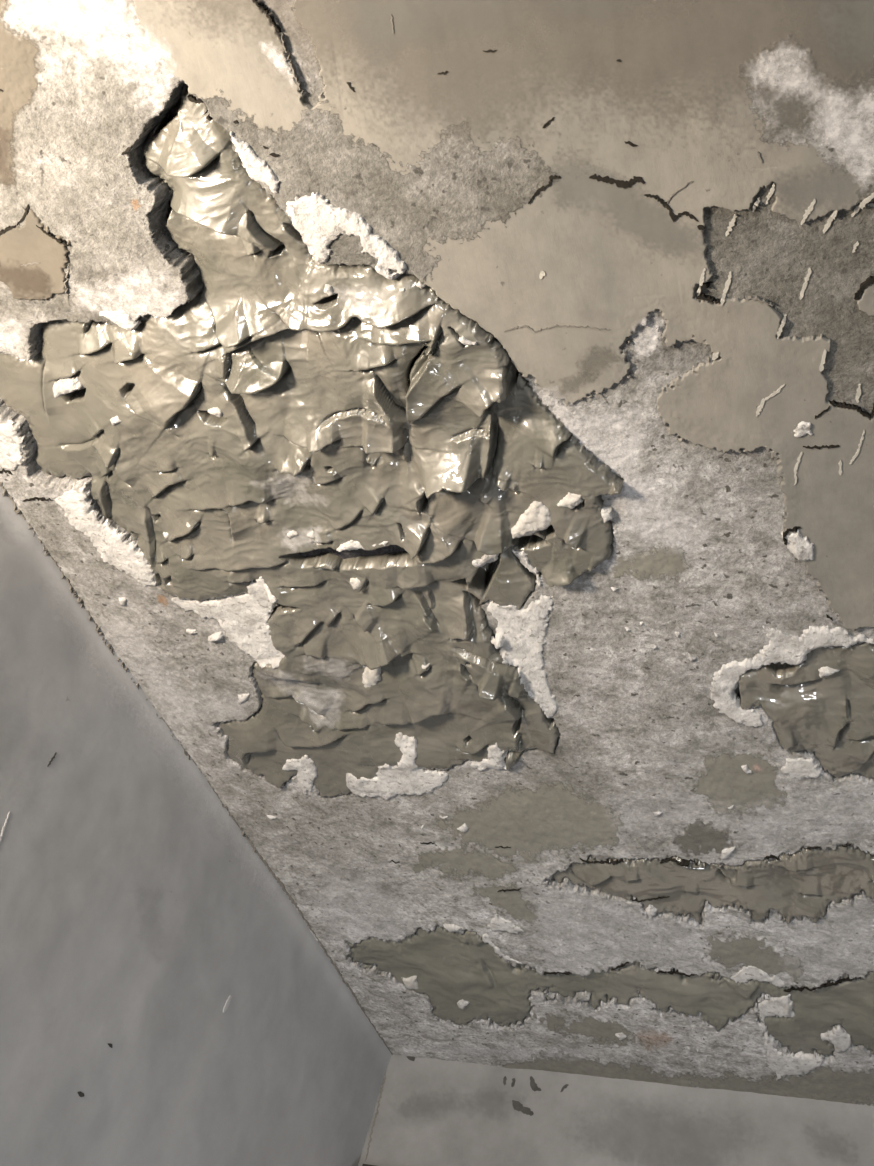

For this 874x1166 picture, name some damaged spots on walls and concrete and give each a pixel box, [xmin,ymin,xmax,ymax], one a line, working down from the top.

crack [252,0,304,97]
spalling [0,0,558,361]
crack [528,175,561,204]
crack [589,174,705,230]
spalling [694,48,874,415]
crack [854,276,874,300]
spalling [0,309,874,1106]
crack [806,842,852,850]
crack [580,857,624,865]
crack [660,857,697,866]
crack [632,895,670,903]